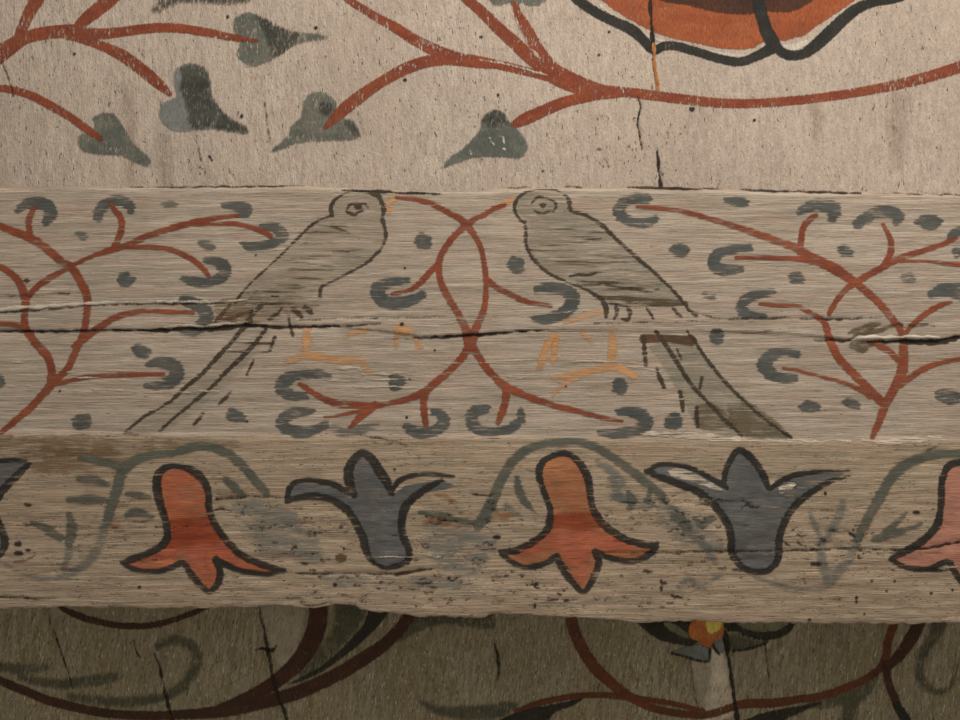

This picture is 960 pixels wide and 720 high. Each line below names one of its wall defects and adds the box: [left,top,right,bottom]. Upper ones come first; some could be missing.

crack [627,0,714,190]
crack [138,182,284,190]
crack [344,188,440,196]
crack [741,187,861,195]
crack [0,292,380,333]
crack [406,309,599,339]
crack [705,315,960,352]
crack [257,608,288,720]